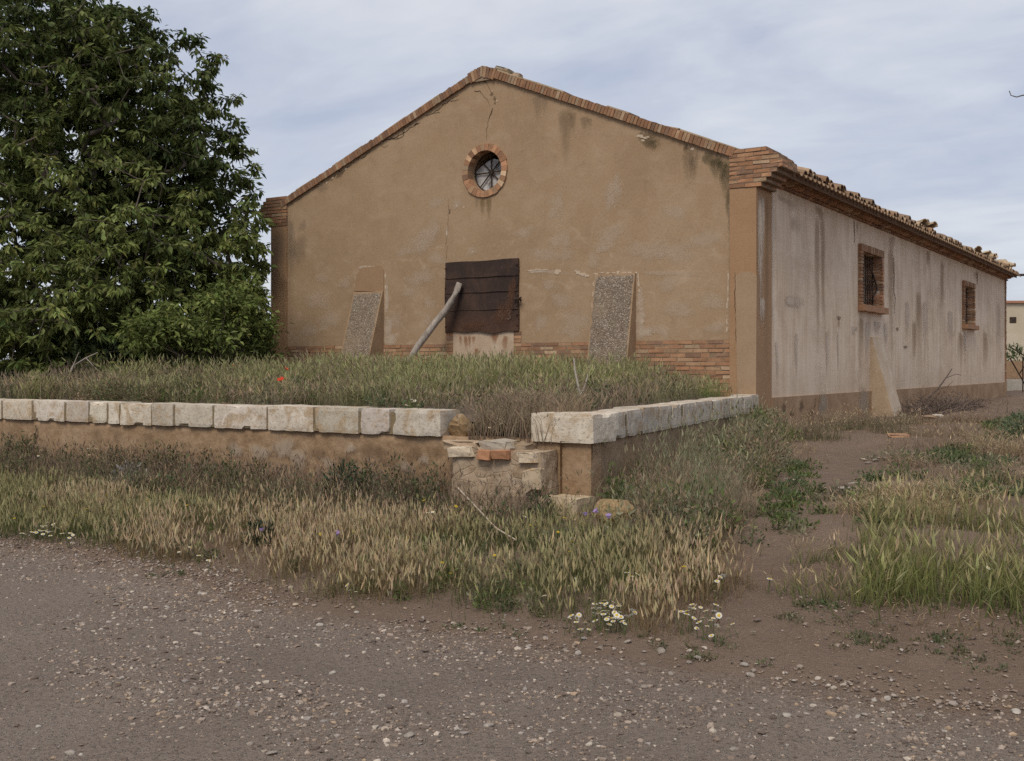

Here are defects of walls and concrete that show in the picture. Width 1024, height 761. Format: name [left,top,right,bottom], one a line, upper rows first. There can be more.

crack [328,81,492,181]